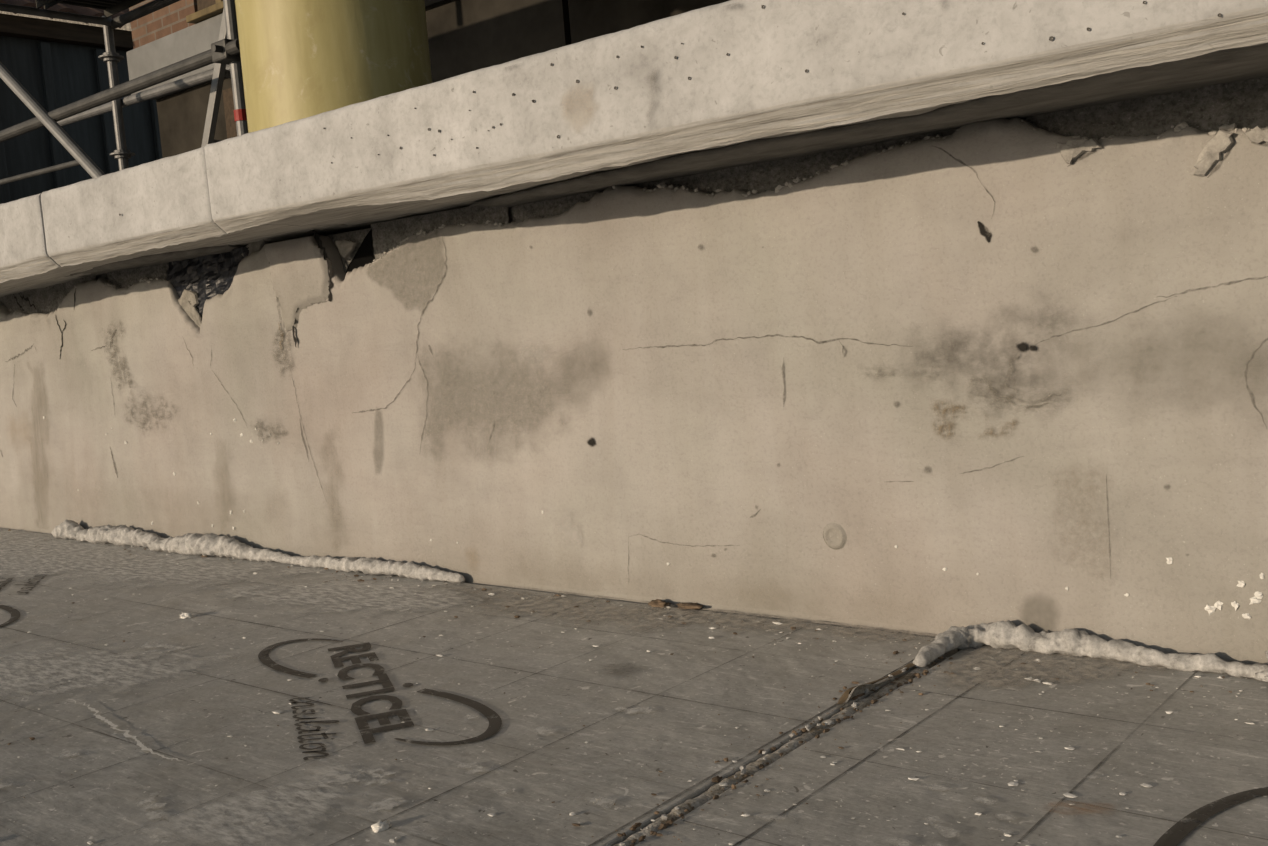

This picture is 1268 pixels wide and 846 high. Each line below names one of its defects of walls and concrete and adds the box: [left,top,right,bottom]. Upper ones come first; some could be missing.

spalling [1021,76,1268,178]
spalling [0,241,268,327]
crack [310,228,373,305]
spalling [368,129,960,266]
crack [932,141,995,202]
spalling [977,221,992,243]
crack [353,242,447,442]